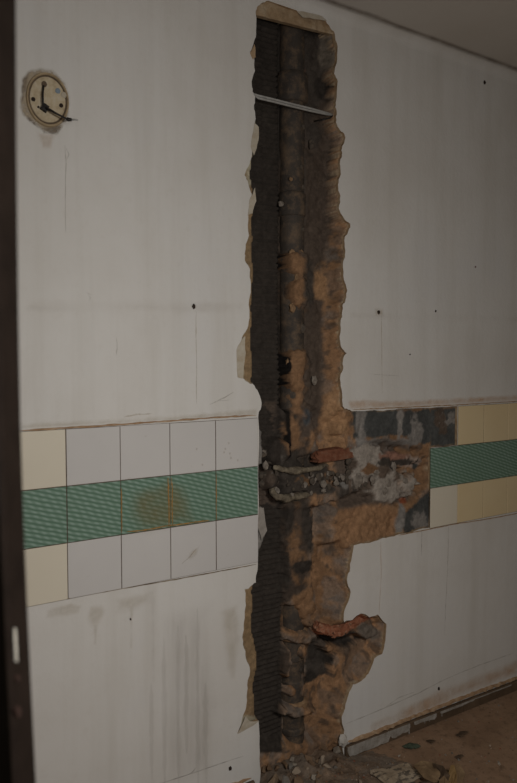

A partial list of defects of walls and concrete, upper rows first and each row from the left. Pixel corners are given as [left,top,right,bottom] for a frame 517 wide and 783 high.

flaking render [236,1,517,773]